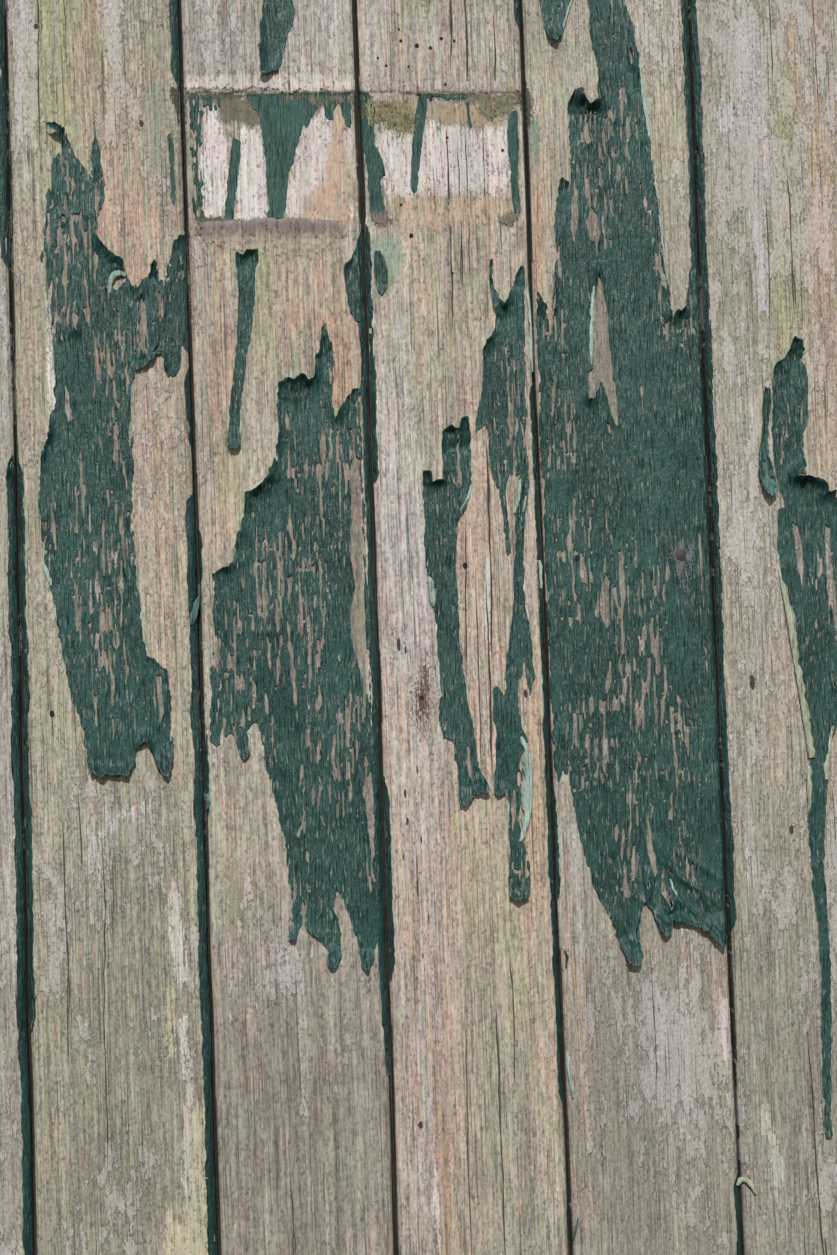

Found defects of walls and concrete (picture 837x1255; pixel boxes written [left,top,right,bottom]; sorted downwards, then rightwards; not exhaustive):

peeling [38,121,191,777]
peeling [227,248,259,449]
peeling [257,0,295,73]
peeling [209,323,379,970]
peeling [422,0,727,966]
peeling [759,335,837,1137]